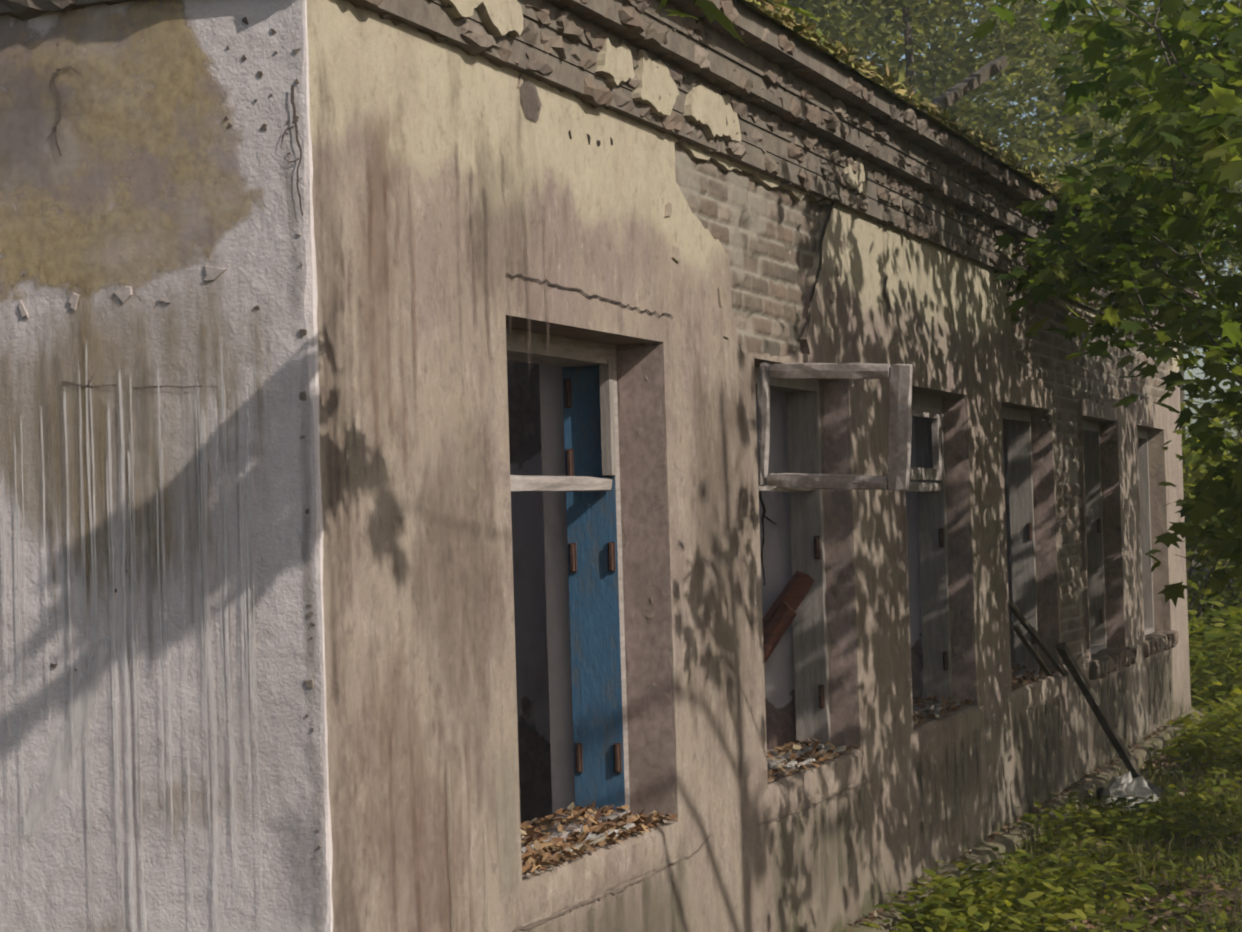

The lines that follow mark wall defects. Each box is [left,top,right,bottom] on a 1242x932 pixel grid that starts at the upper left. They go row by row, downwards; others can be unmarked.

crack [47,66,80,156]
peeling [0,0,259,319]
crack [281,85,303,216]
flaking render [517,73,541,121]
flaking render [664,144,825,357]
leakage [197,343,226,523]
flaking render [1003,281,1173,671]
leakage [3,300,184,932]
leakage [202,485,257,724]
leakage [207,726,238,932]